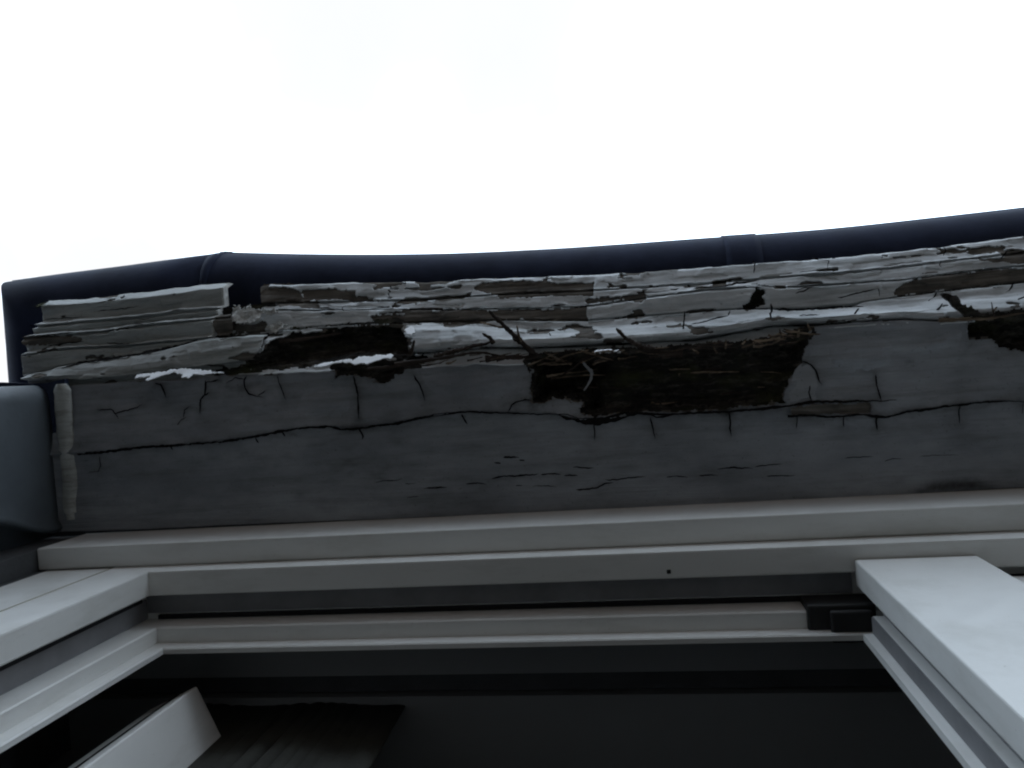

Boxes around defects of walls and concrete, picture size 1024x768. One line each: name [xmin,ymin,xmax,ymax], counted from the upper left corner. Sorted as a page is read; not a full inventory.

peeling [889,246,1024,299]
peeling [21,333,82,349]
peeling [212,314,267,337]
peeling [260,283,360,309]
peeling [370,276,647,336]
peeling [134,368,224,381]
peeling [788,363,817,402]
crack [78,361,1023,473]